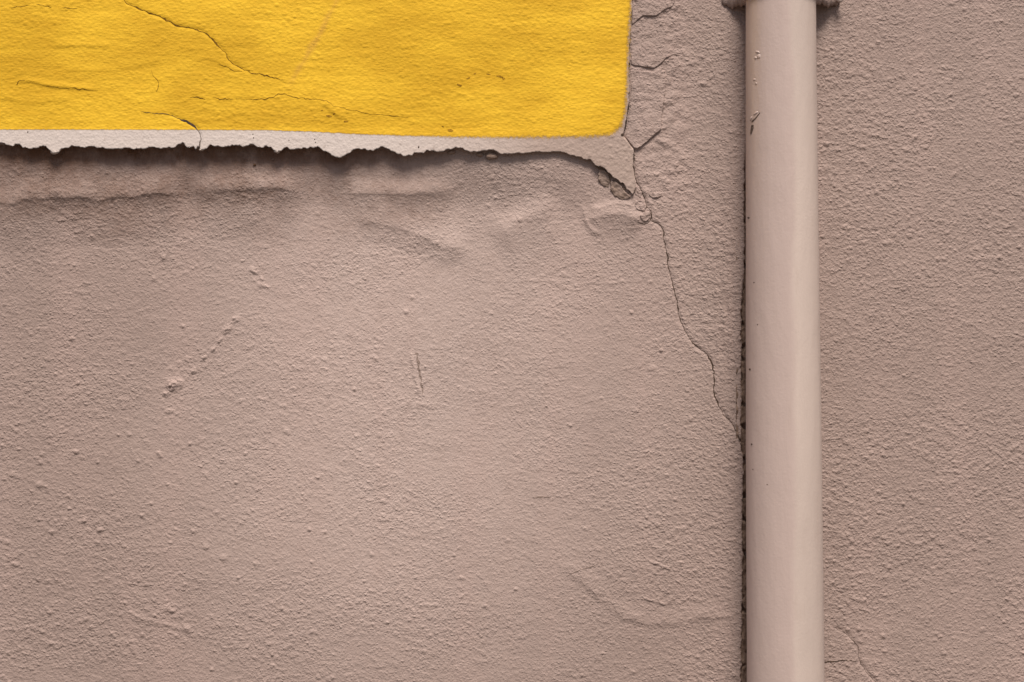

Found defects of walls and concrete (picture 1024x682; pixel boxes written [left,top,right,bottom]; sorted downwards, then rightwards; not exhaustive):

crack [124,0,405,150]
flaking render [476,152,498,160]
crack [625,13,742,446]